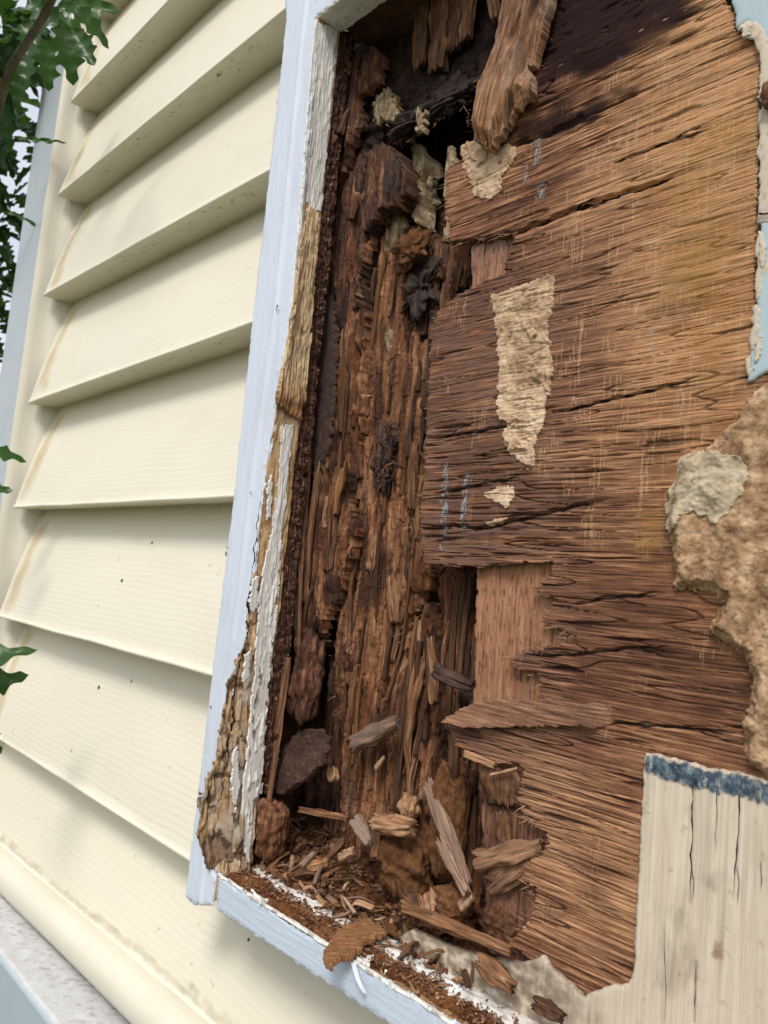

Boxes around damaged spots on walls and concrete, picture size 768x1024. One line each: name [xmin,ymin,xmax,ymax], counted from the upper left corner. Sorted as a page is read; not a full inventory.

spalling [393,91,517,236]
peeling [735,21,768,376]
crack [439,374,704,438]
peeling [196,22,356,946]
peeling [664,450,749,537]
crack [574,593,660,606]
crack [540,645,695,658]
crack [690,761,762,905]
peeling [350,935,539,1024]